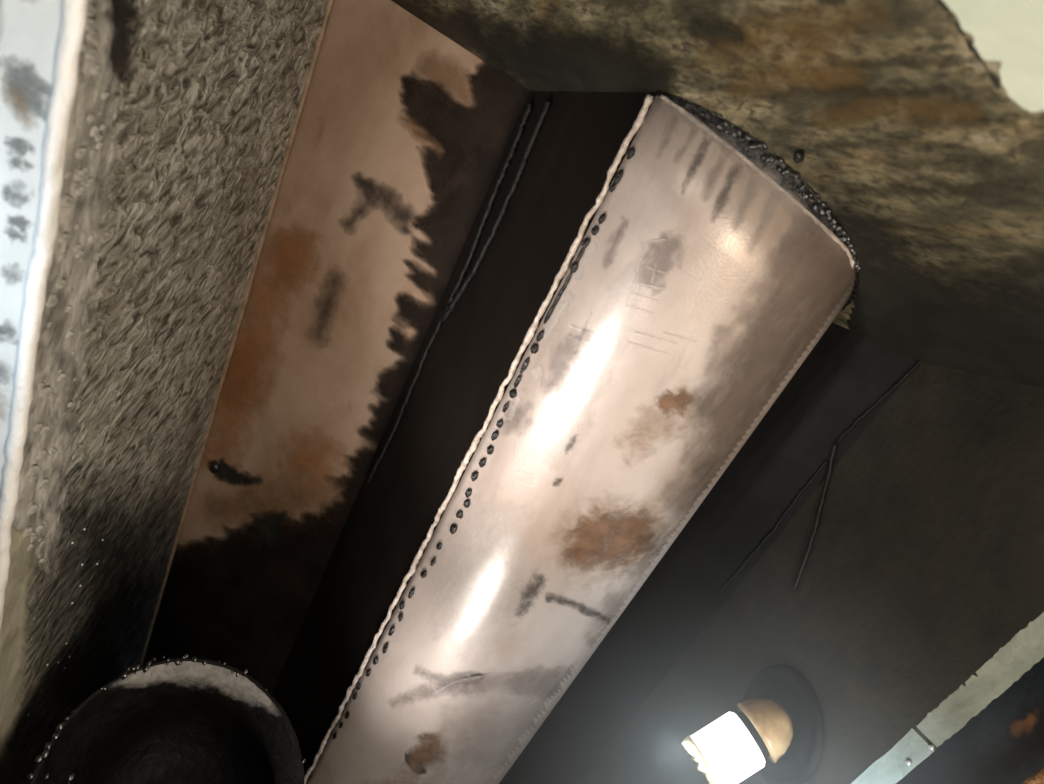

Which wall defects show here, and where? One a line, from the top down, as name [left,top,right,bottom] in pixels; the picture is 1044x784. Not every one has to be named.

water stain [9,67,48,120]
water stain [7,139,30,167]
water stain [345,176,413,230]
water stain [717,169,738,211]
water stain [9,218,27,241]
corrosion [636,392,691,438]
corrosion [567,514,653,566]